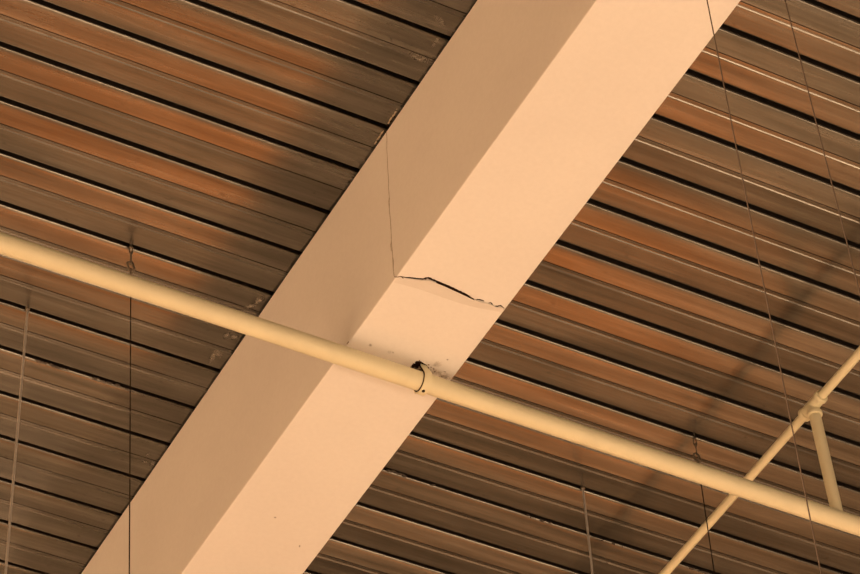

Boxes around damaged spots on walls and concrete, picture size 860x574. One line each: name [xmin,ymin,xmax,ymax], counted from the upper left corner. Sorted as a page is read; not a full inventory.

crack [386,131,505,310]